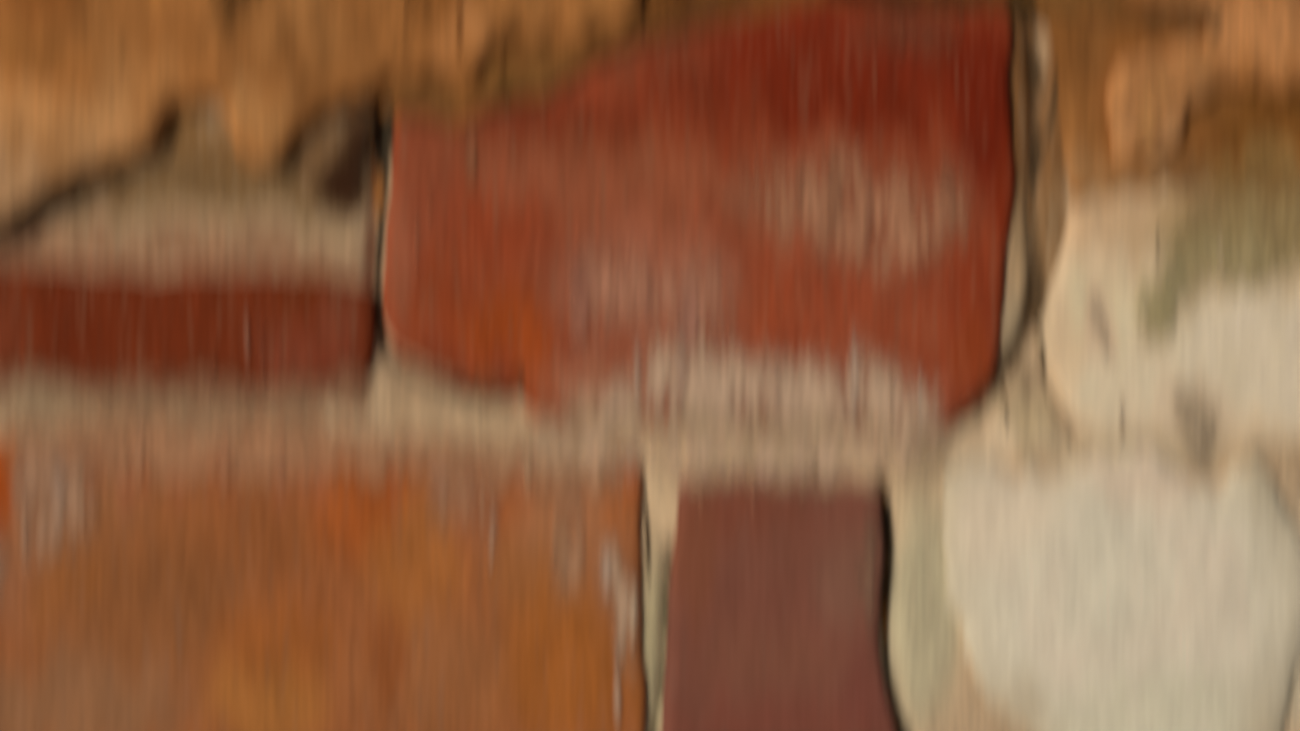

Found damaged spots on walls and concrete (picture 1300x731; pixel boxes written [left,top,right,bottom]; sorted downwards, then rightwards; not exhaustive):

spalling [314,108,384,216]